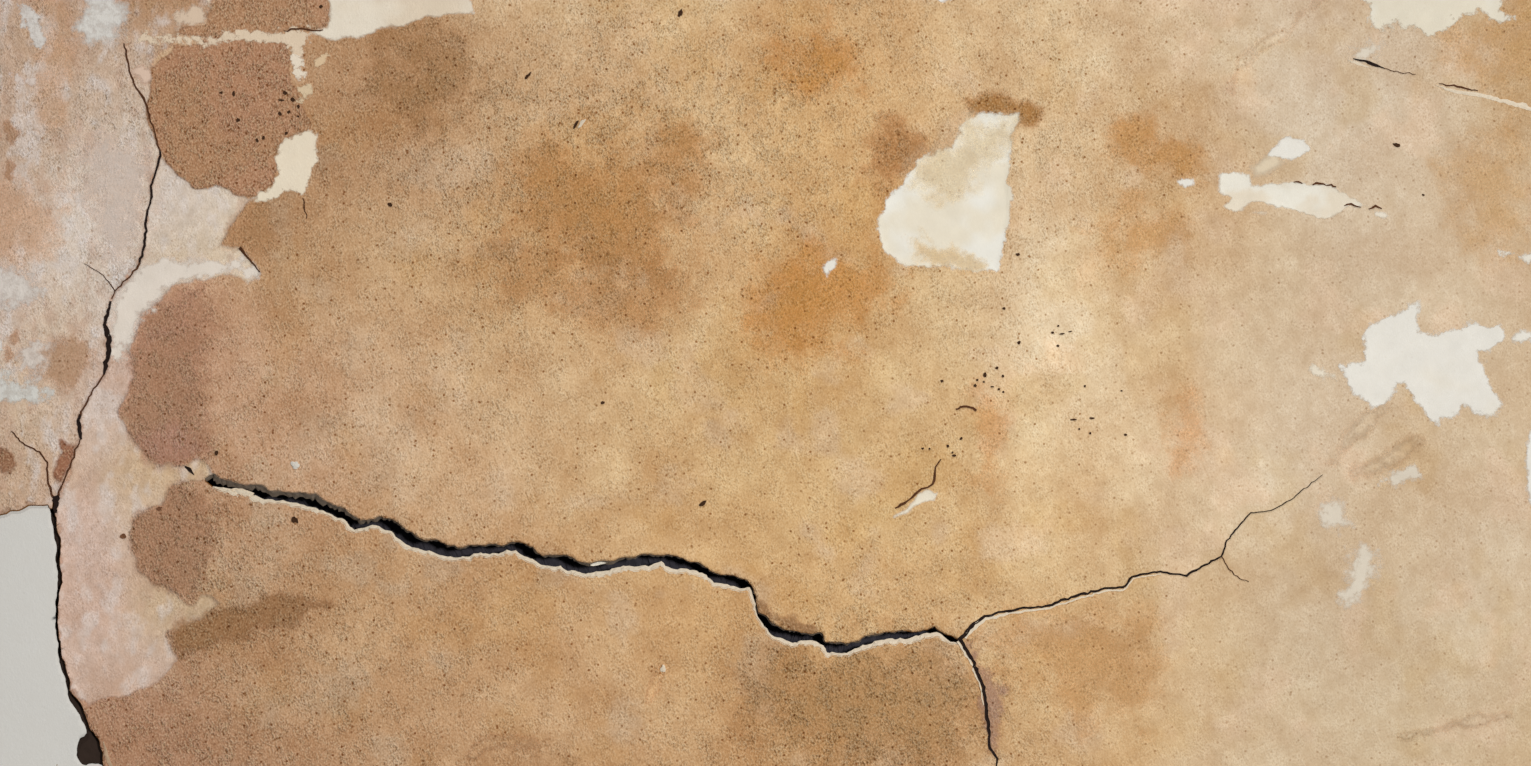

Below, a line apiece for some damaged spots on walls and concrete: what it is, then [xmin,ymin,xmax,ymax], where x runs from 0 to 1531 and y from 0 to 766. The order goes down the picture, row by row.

water stain [147,0,329,196]
peeling [0,0,216,516]
crack [239,247,260,272]
water stain [48,339,88,386]
crack [11,43,162,766]
water stain [125,302,207,463]
water stain [132,489,210,590]
water stain [174,594,329,657]
peeling [68,480,997,766]
crack [185,459,1322,766]
water stain [758,601,817,633]
water stain [973,654,1005,743]